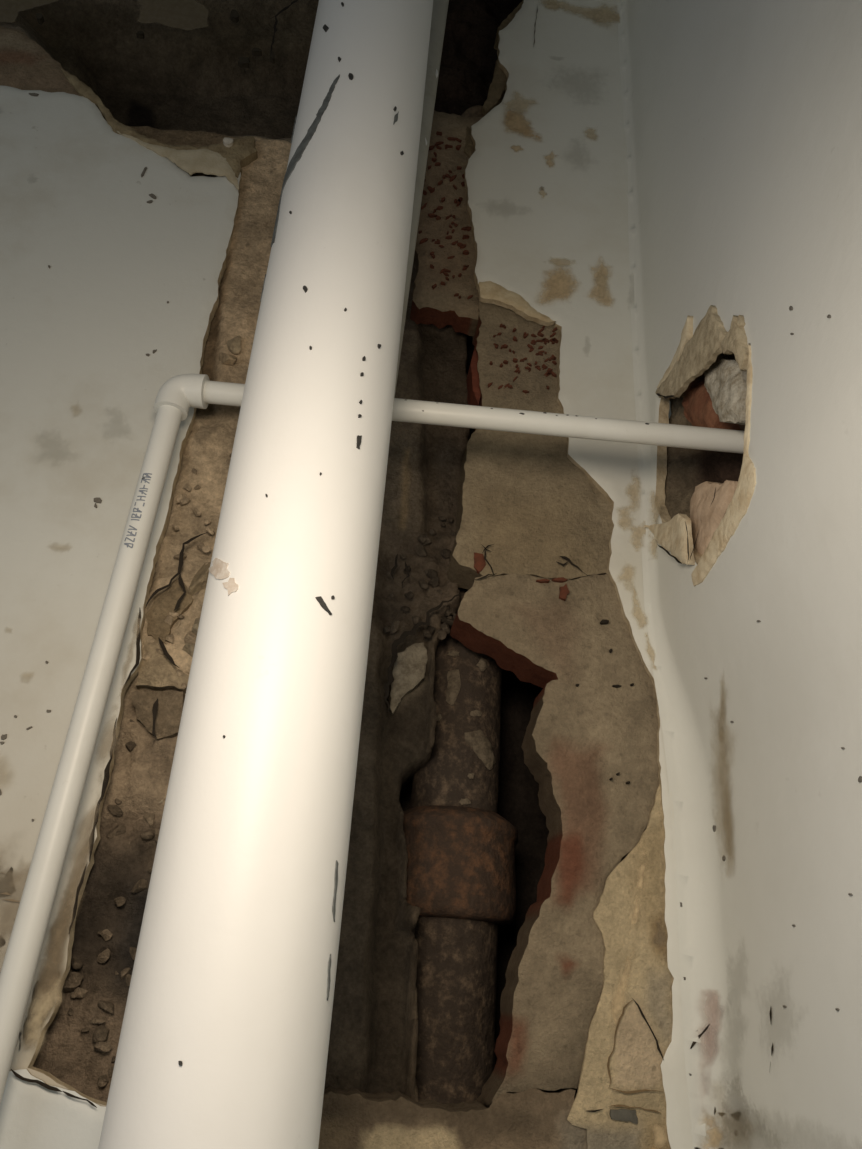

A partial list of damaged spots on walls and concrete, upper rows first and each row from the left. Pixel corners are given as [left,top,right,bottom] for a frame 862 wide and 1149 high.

peeling [0,0,258,190]
spalling [410,0,562,414]
spalling [644,305,756,586]
crack [124,609,141,685]
spalling [130,468,215,740]
crack [475,544,497,580]
crack [536,556,590,601]
spalling [62,957,116,1088]
crack [69,718,117,934]
spalling [97,929,137,986]
spalling [114,866,153,907]
spalling [315,429,673,1149]